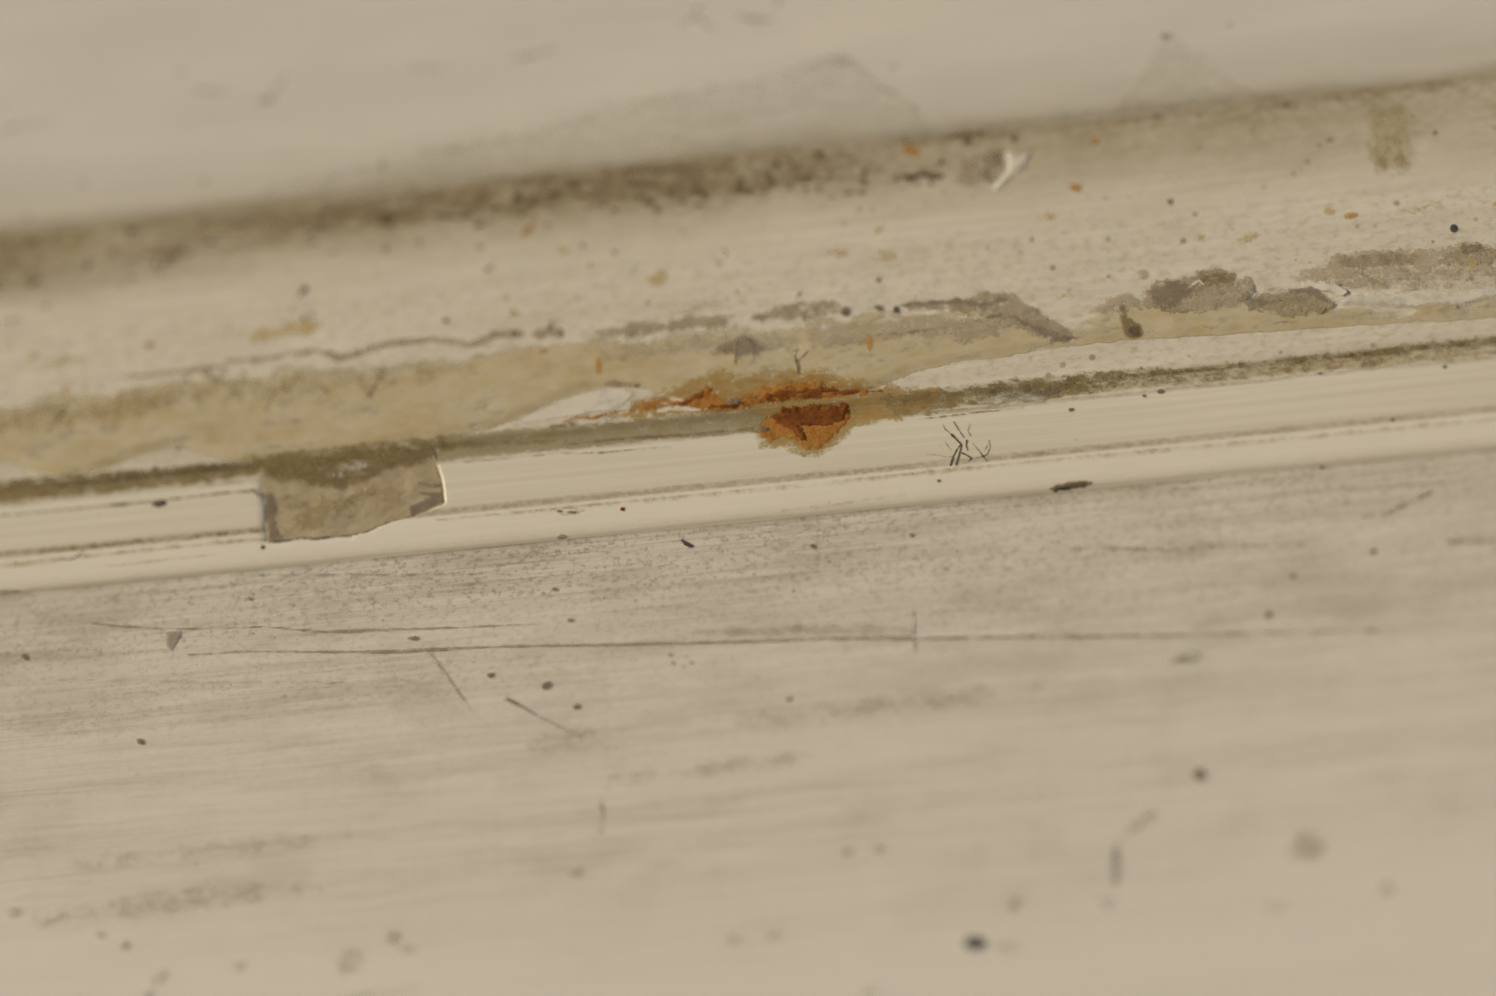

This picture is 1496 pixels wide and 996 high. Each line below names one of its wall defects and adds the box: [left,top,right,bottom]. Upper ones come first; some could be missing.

peeling [1089,241,1496,318]
peeling [123,320,563,381]
peeling [597,303,726,341]
peeling [751,291,1073,349]
peeling [604,380,639,388]
rust [563,369,943,457]
spalling [252,435,445,543]